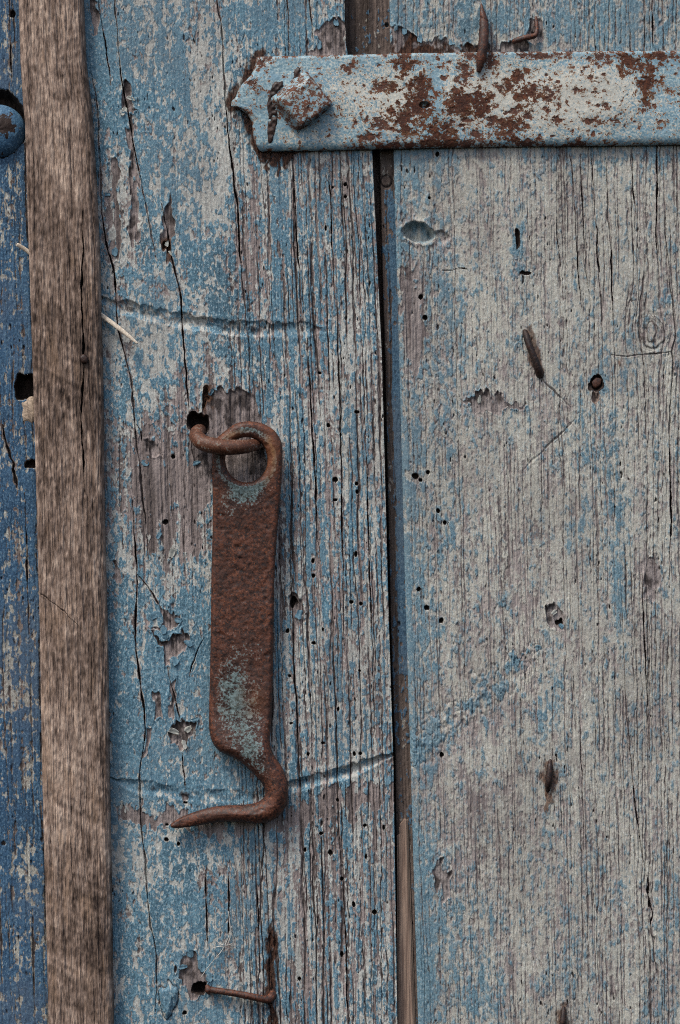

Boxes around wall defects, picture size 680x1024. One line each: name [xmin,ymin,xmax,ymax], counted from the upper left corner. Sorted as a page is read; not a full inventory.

crack [103,31,139,170]
rust [226,48,306,177]
peeling [307,17,346,56]
rust [381,34,547,148]
rust [616,51,673,103]
crack [226,110,242,267]
crack [167,229,189,406]
peeling [127,419,211,565]
crack [133,520,159,743]
peeling [150,607,193,667]
peeling [142,680,198,759]
peeling [178,949,212,1001]